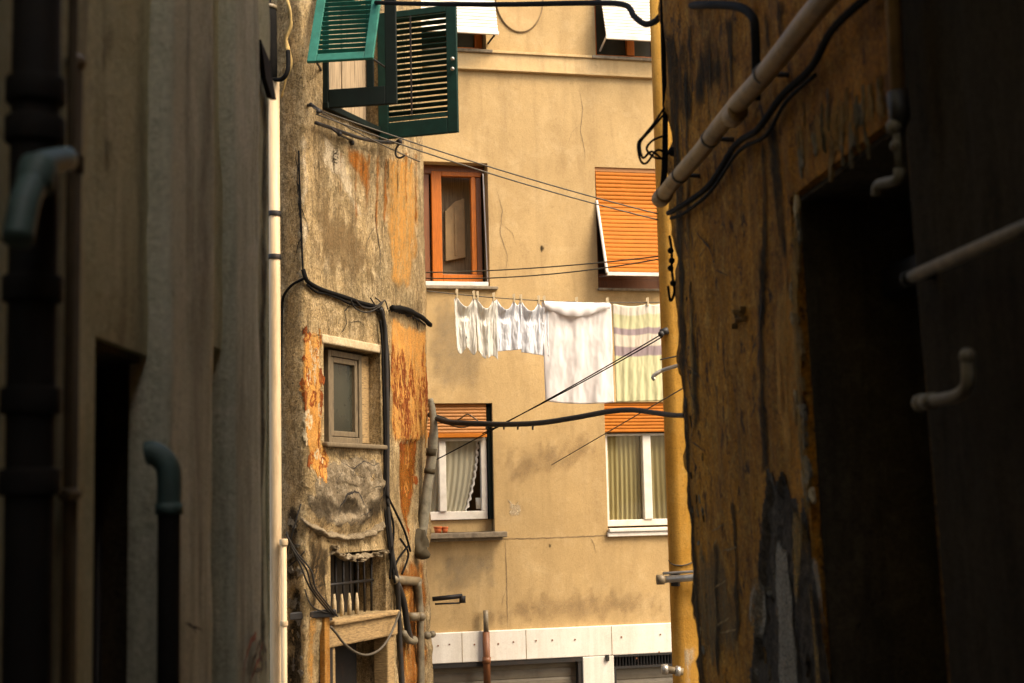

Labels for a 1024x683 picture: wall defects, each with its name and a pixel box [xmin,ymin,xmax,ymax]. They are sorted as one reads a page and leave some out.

water stain [664,20,732,168]
rust [349,151,418,284]
crack [497,192,515,276]
water stain [758,125,788,470]
peeling [299,325,329,485]
peeling [391,319,428,537]
water stain [676,178,740,683]
spalling [749,194,830,683]
spalling [328,545,390,562]